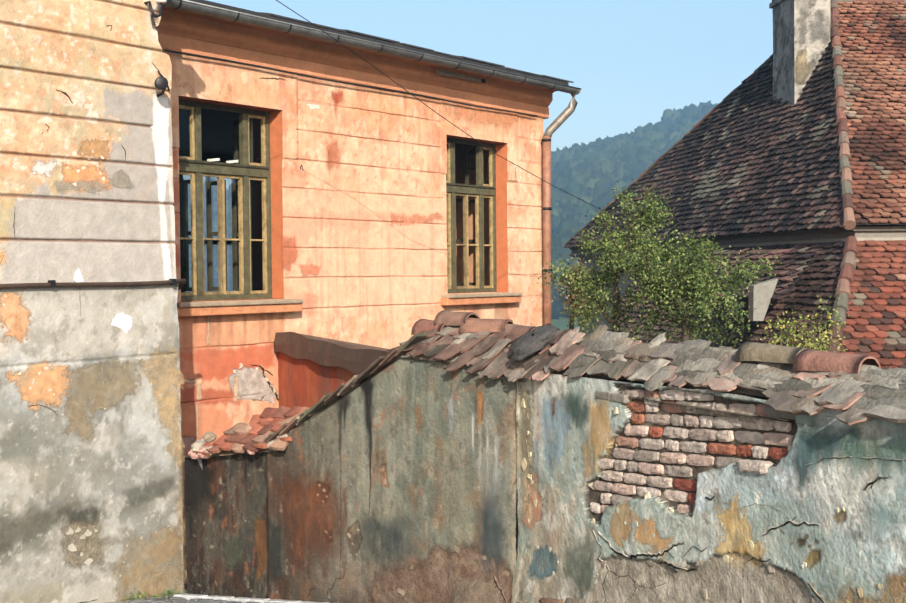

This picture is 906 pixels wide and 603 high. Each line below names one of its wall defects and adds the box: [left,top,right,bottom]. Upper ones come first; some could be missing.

flaking render [31,138,114,191]
peeling [0,288,31,342]
flaking render [229,363,276,404]
flaking render [6,349,201,507]
flaking render [539,384,821,603]
damp [794,426,859,485]
crack [806,456,906,491]
damp [0,506,97,549]
flaking render [61,520,105,567]
peeling [528,545,559,579]
crack [741,503,819,537]
crack [744,557,826,603]